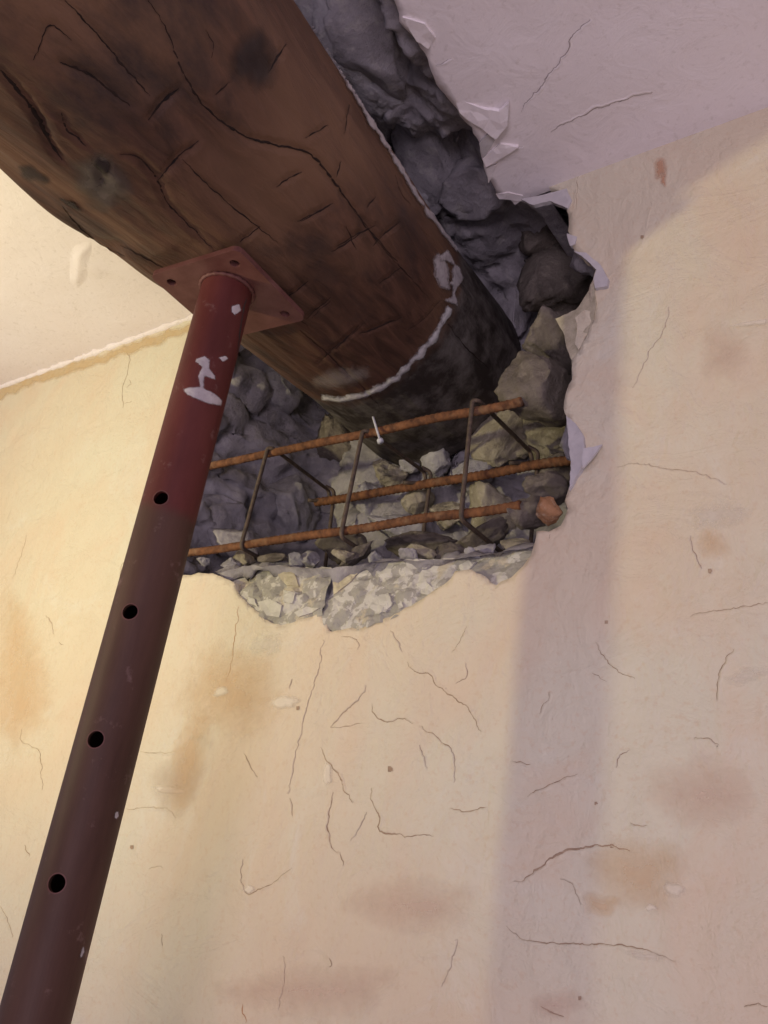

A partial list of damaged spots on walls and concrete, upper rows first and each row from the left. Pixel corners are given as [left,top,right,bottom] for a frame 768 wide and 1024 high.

flaking render [402,16,435,49]
crack [0,70,86,160]
crack [33,0,430,300]
flaking render [456,99,519,183]
flaking render [496,188,572,210]
flaking render [556,234,610,360]
flaking render [566,416,603,491]
flaking render [233,549,533,632]
crack [389,626,484,732]
crack [287,636,455,865]
crack [514,844,630,905]
crack [505,927,677,965]